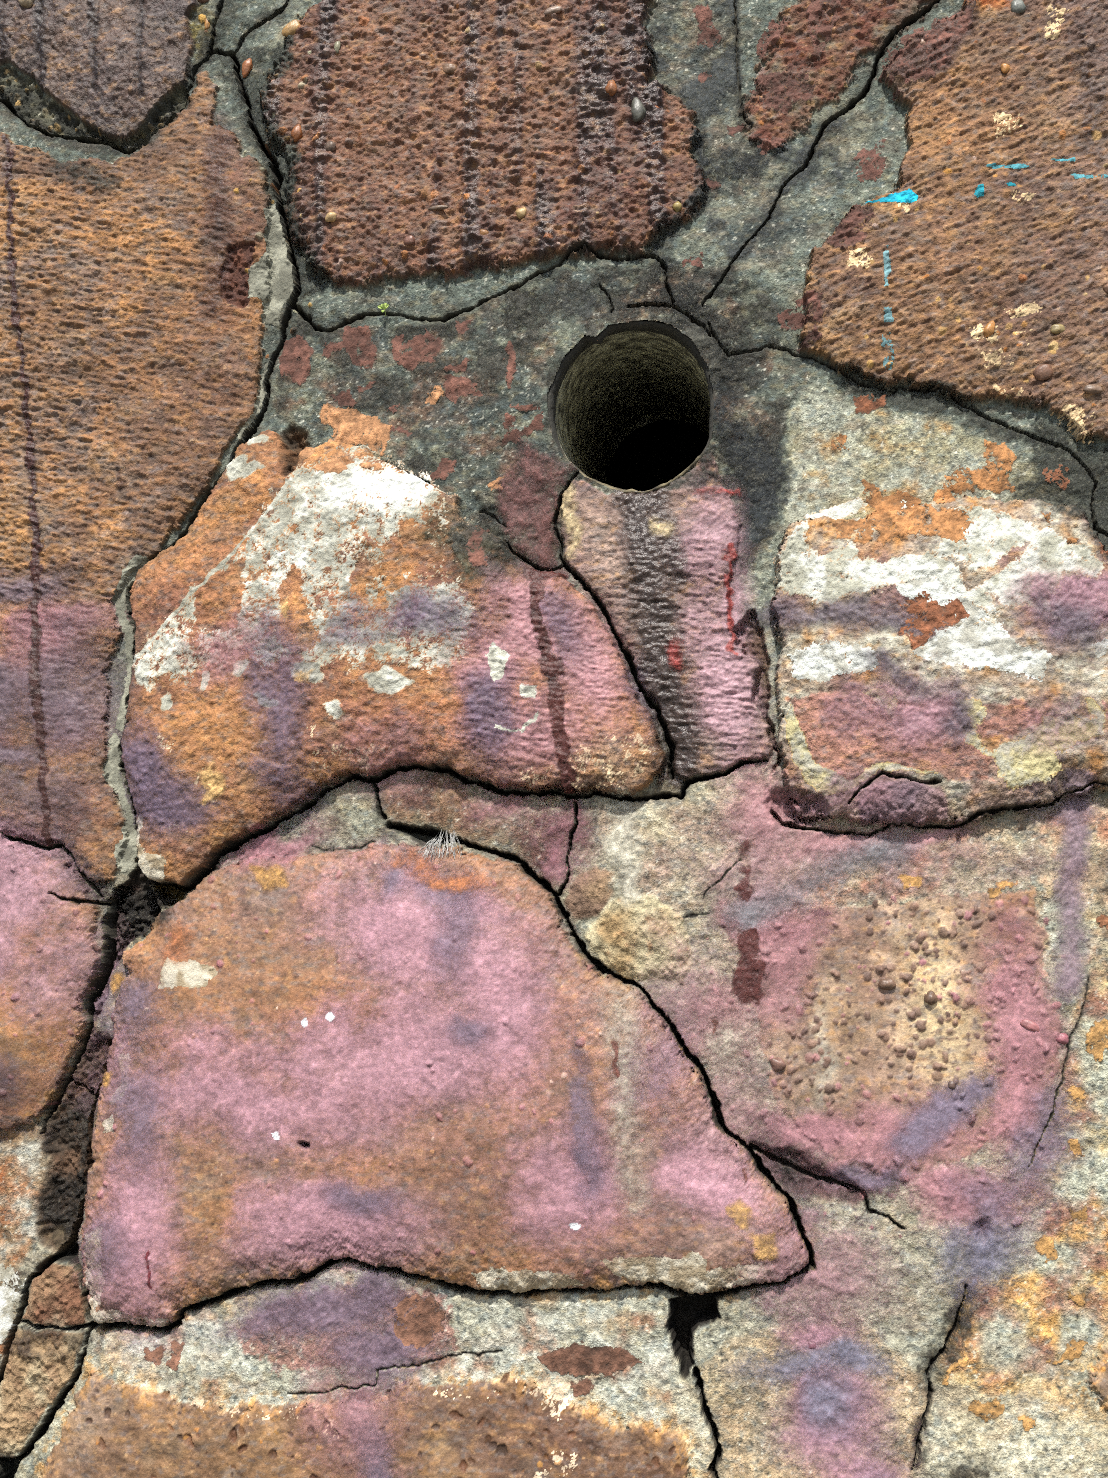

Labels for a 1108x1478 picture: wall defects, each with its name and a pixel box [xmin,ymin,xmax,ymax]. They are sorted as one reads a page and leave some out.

crack [0,0,1108,653]
crack [770,771,1108,837]
crack [0,474,904,1478]
crack [1028,976,1090,1167]
crack [912,1285,967,1470]